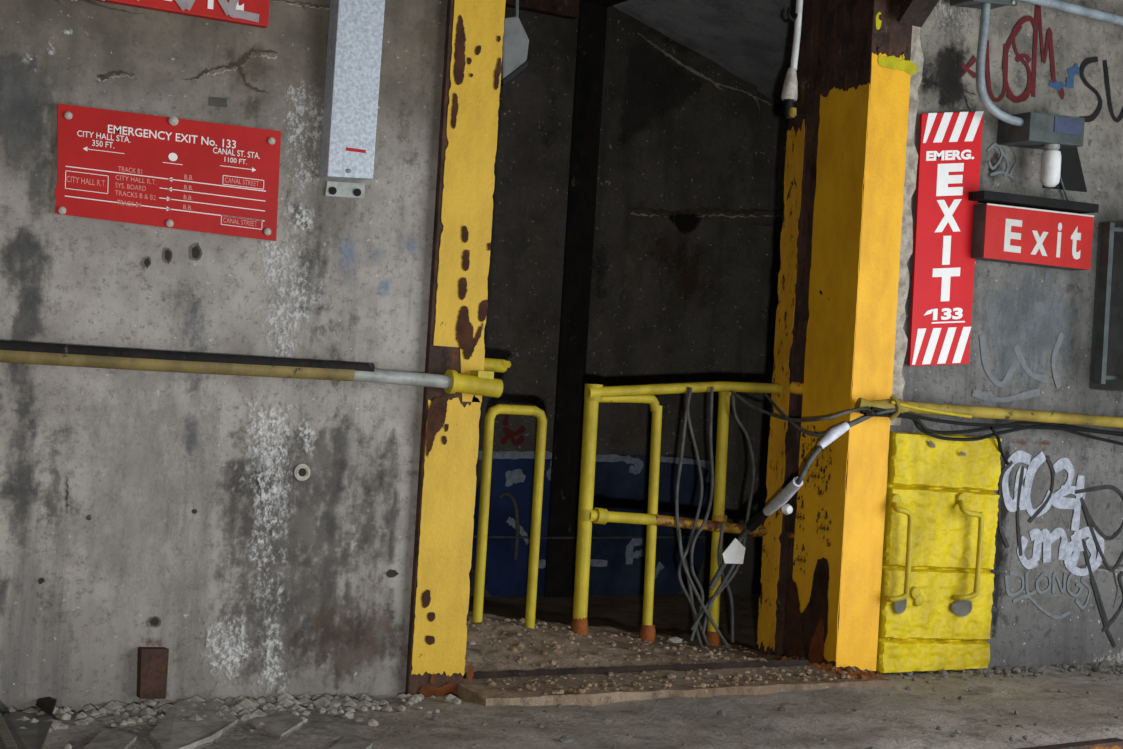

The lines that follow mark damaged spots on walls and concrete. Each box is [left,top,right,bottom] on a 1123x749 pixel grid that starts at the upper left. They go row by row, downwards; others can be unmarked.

crack [56,0,142,14]
crack [96,70,135,82]
crack [185,45,278,94]
peeling [451,15,481,129]
peeling [494,58,502,90]
leakage [1,228,49,342]
peeling [456,226,488,360]
leakage [1,363,78,544]
leakage [87,369,216,605]
peeling [795,424,832,547]
leakage [205,398,407,694]
rust [420,665,473,697]